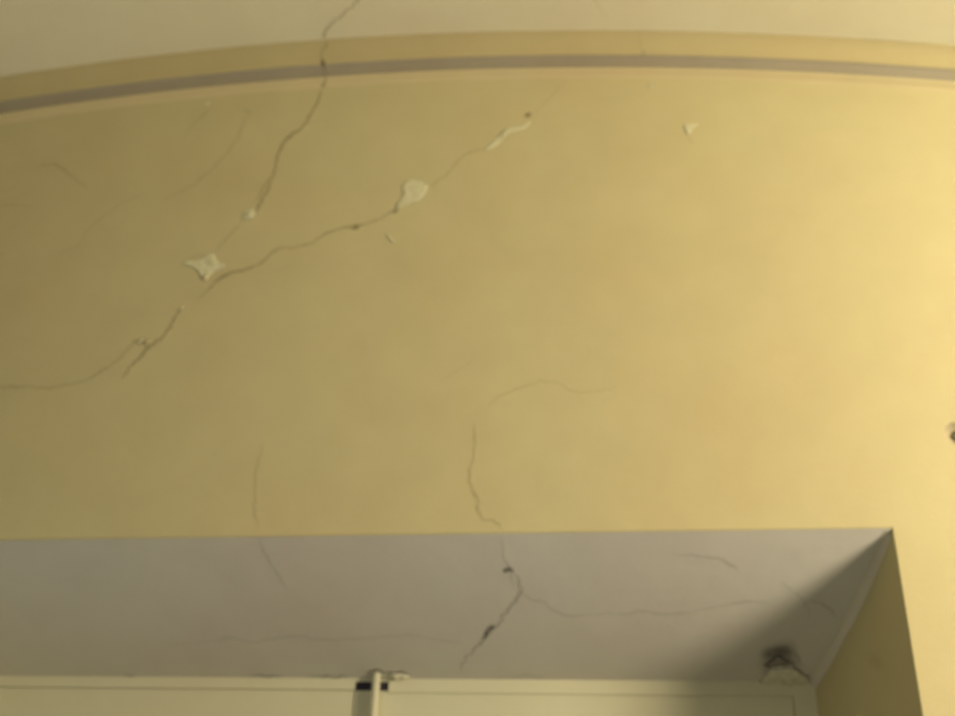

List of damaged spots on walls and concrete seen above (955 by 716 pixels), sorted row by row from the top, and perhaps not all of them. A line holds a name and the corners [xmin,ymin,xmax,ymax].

peeling [389,180,428,213]
peeling [182,254,226,281]